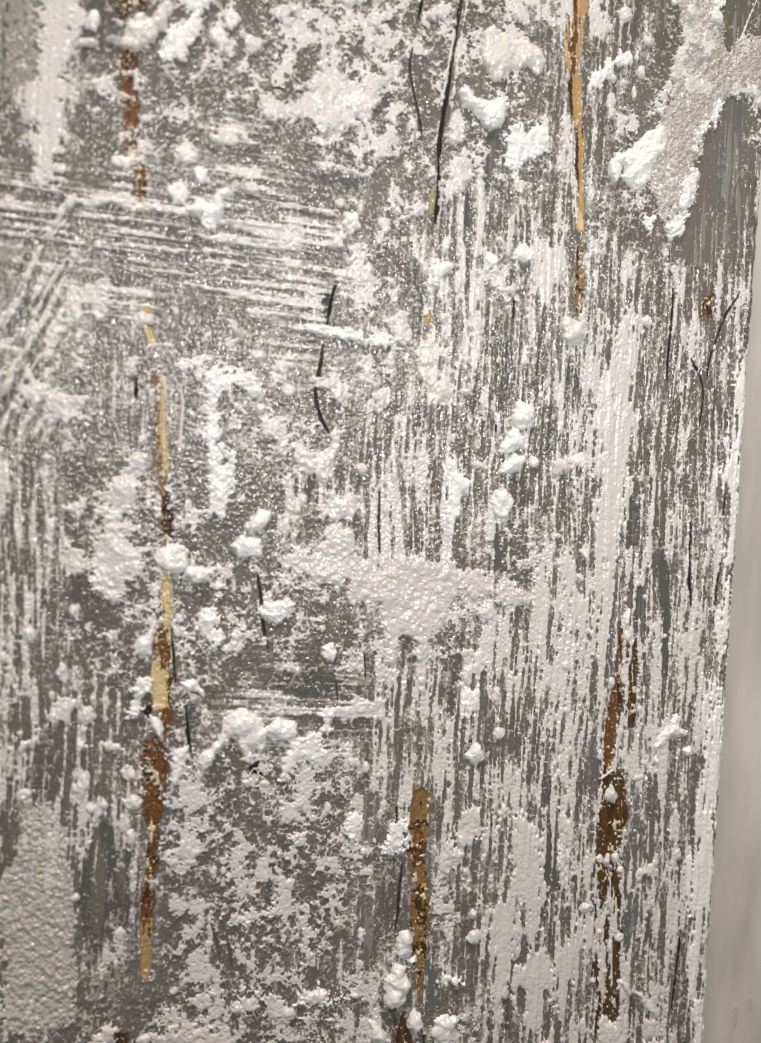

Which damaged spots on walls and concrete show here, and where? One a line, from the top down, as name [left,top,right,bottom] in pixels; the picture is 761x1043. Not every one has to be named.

crack [408,0,463,223]
rust [574,245,585,317]
rust [150,372,171,547]
rust [137,604,174,939]
rust [405,787,430,1008]